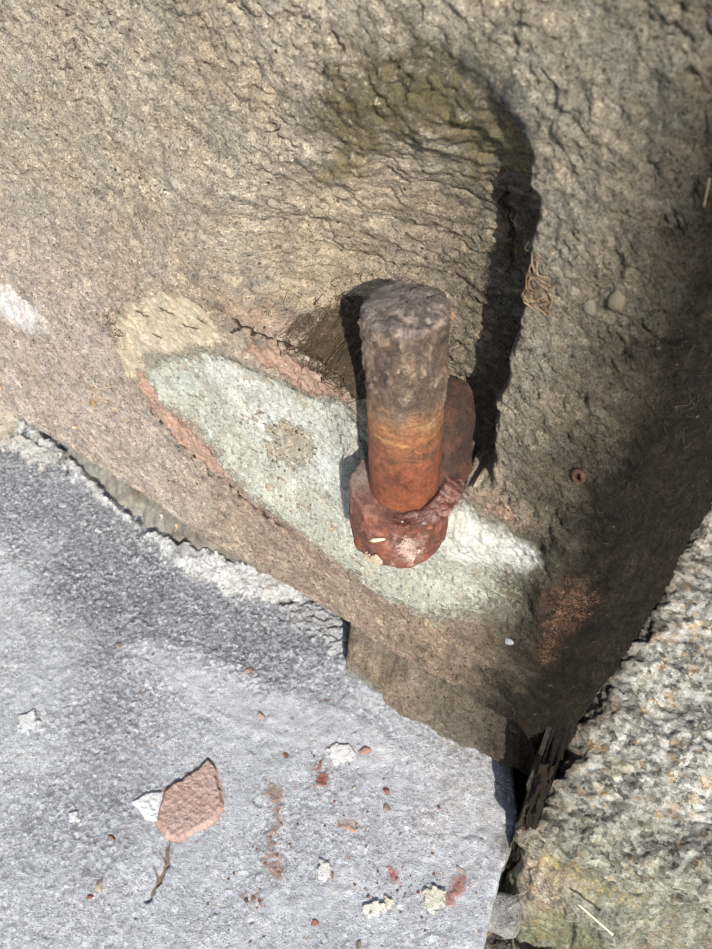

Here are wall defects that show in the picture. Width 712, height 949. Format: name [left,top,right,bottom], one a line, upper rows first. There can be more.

water stain [305,14,539,198]
peeling [110,290,233,479]
peeling [243,339,350,407]
spalling [262,418,317,472]
rust [388,472,465,529]
rust [476,492,528,526]